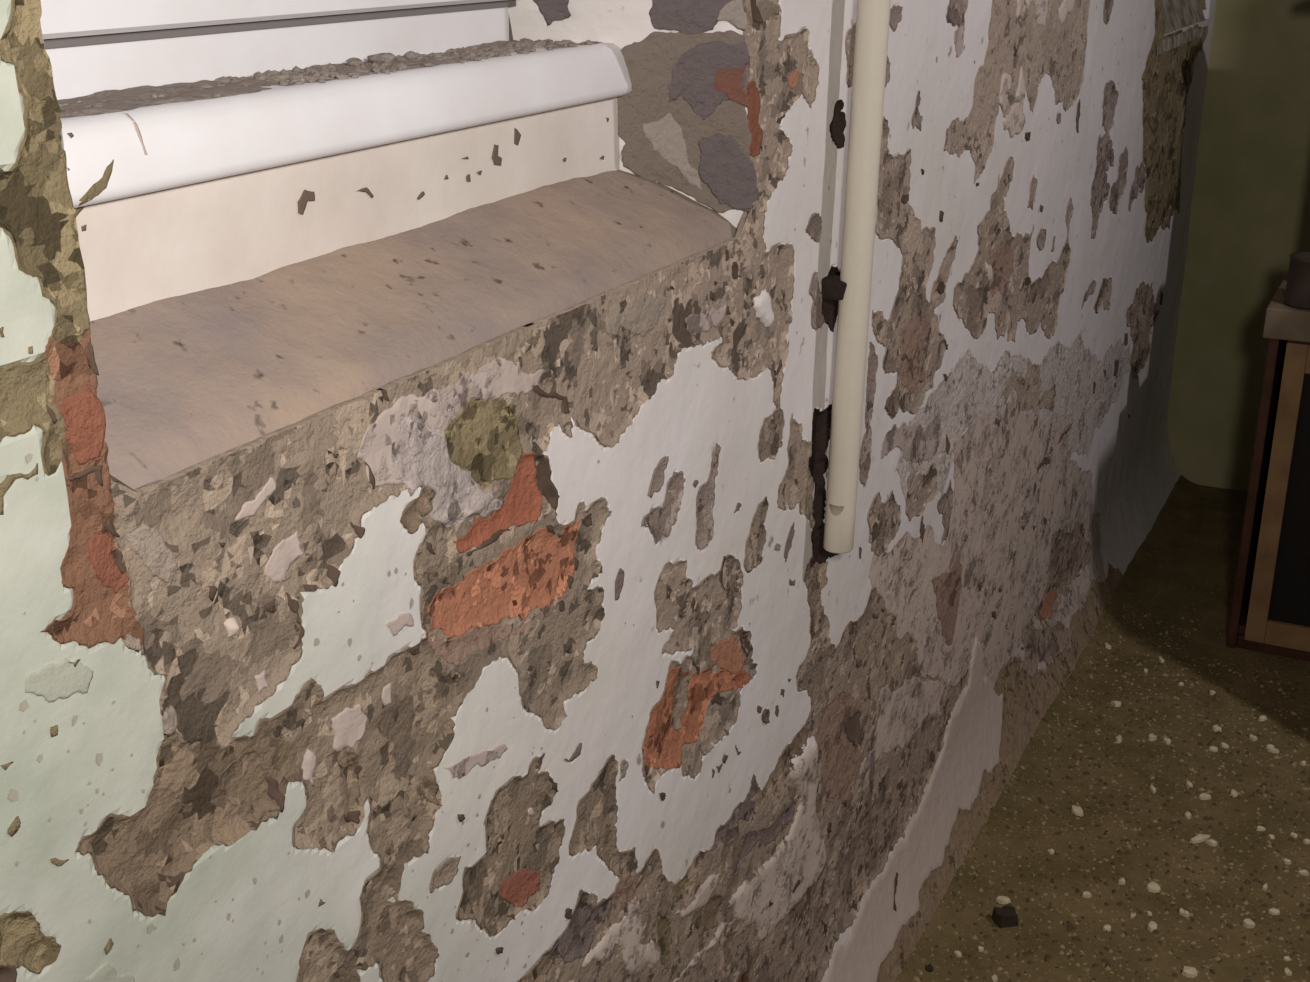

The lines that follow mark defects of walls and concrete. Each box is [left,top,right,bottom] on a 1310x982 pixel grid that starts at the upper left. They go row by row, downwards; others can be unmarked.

peeling [1056,99,1080,133]
spalling [1090,0,1204,243]
spalling [859,116,1074,559]
spalling [1081,277,1112,314]
spalling [1093,281,1163,394]
spalling [0,0,970,982]